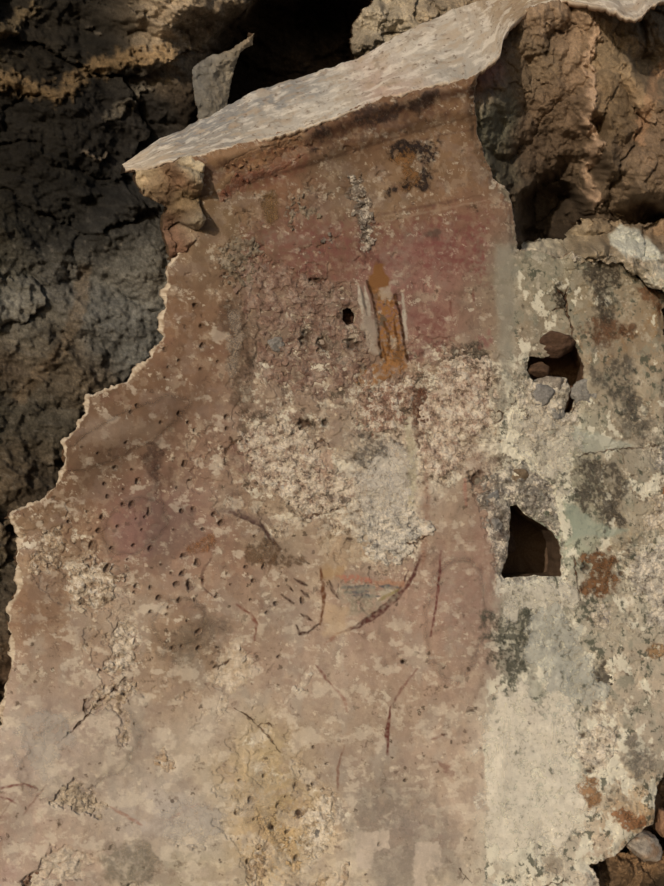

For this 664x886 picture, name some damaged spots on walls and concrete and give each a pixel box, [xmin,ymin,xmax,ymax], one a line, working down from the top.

spalling [216,234,567,584]
spalling [511,331,597,443]
crack [65,677,129,737]
spalling [22,845,95,886]